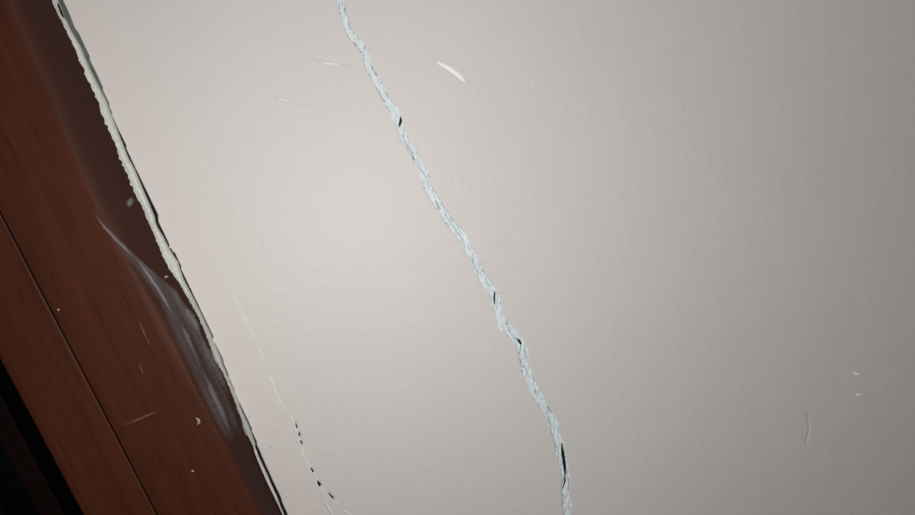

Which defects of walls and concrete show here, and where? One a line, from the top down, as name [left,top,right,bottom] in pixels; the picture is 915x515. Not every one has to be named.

crack [52,0,290,515]
crack [213,251,352,515]
crack [336,0,573,515]